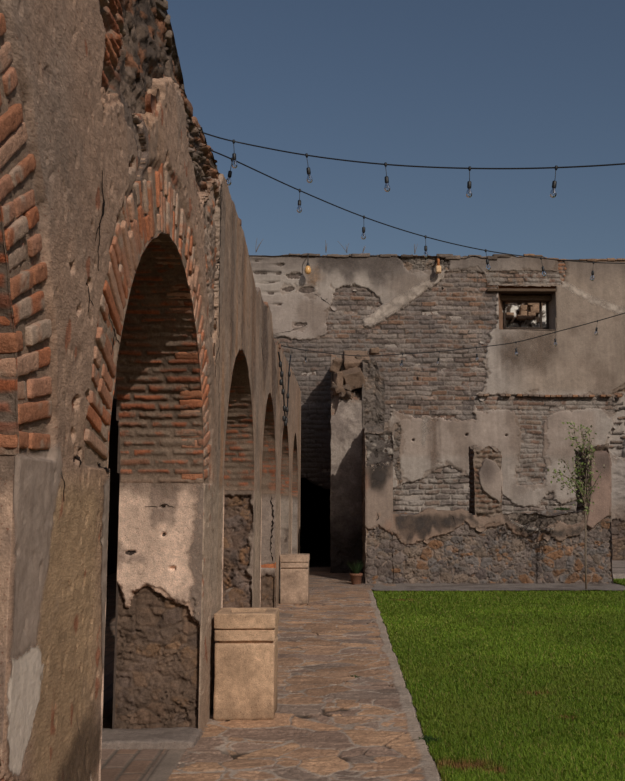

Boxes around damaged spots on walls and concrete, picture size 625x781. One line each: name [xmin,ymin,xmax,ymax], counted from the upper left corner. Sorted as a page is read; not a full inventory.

crack [86,171,121,386]
flaking render [99,0,219,356]
flaking render [273,257,625,513]
flaking render [365,492,625,584]
flaking render [114,586,200,729]